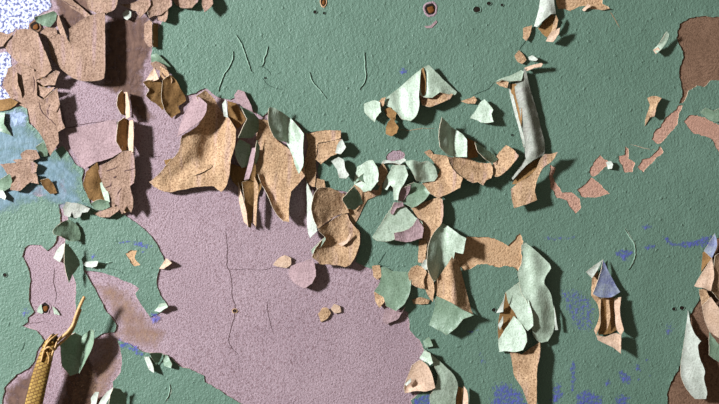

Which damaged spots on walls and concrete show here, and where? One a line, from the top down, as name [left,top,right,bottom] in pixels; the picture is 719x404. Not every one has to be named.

crack [218,34,282,91]
crack [359,52,367,89]
peeling [496,51,613,213]
peeling [523,0,610,42]
flaking render [619,16,719,172]
flaking render [0,0,558,404]
crack [226,236,277,363]
peeling [586,260,624,353]
flaking render [667,233,719,404]